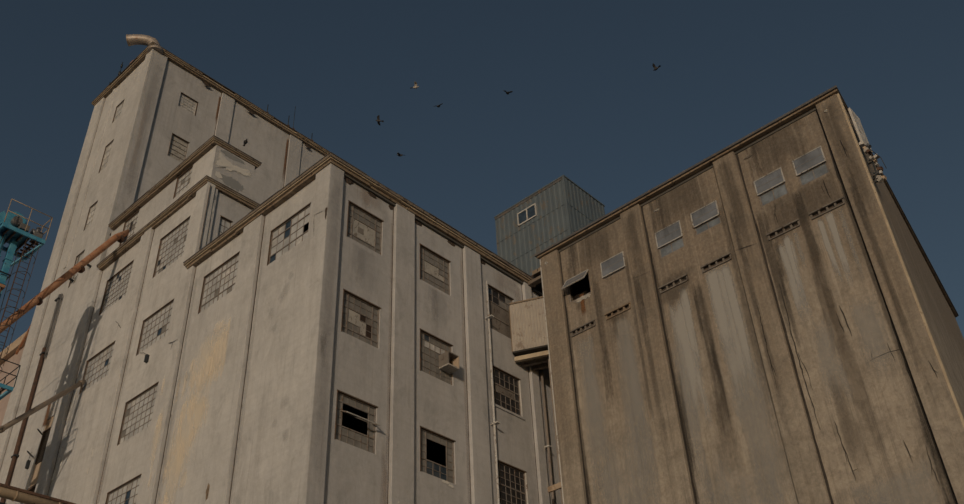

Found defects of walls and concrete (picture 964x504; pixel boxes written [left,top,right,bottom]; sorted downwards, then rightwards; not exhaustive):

water stain [779,236,806,309]
water stain [818,213,849,279]
water stain [670,289,709,410]
water stain [707,267,757,413]
crack [757,306,777,388]
crack [779,284,856,479]